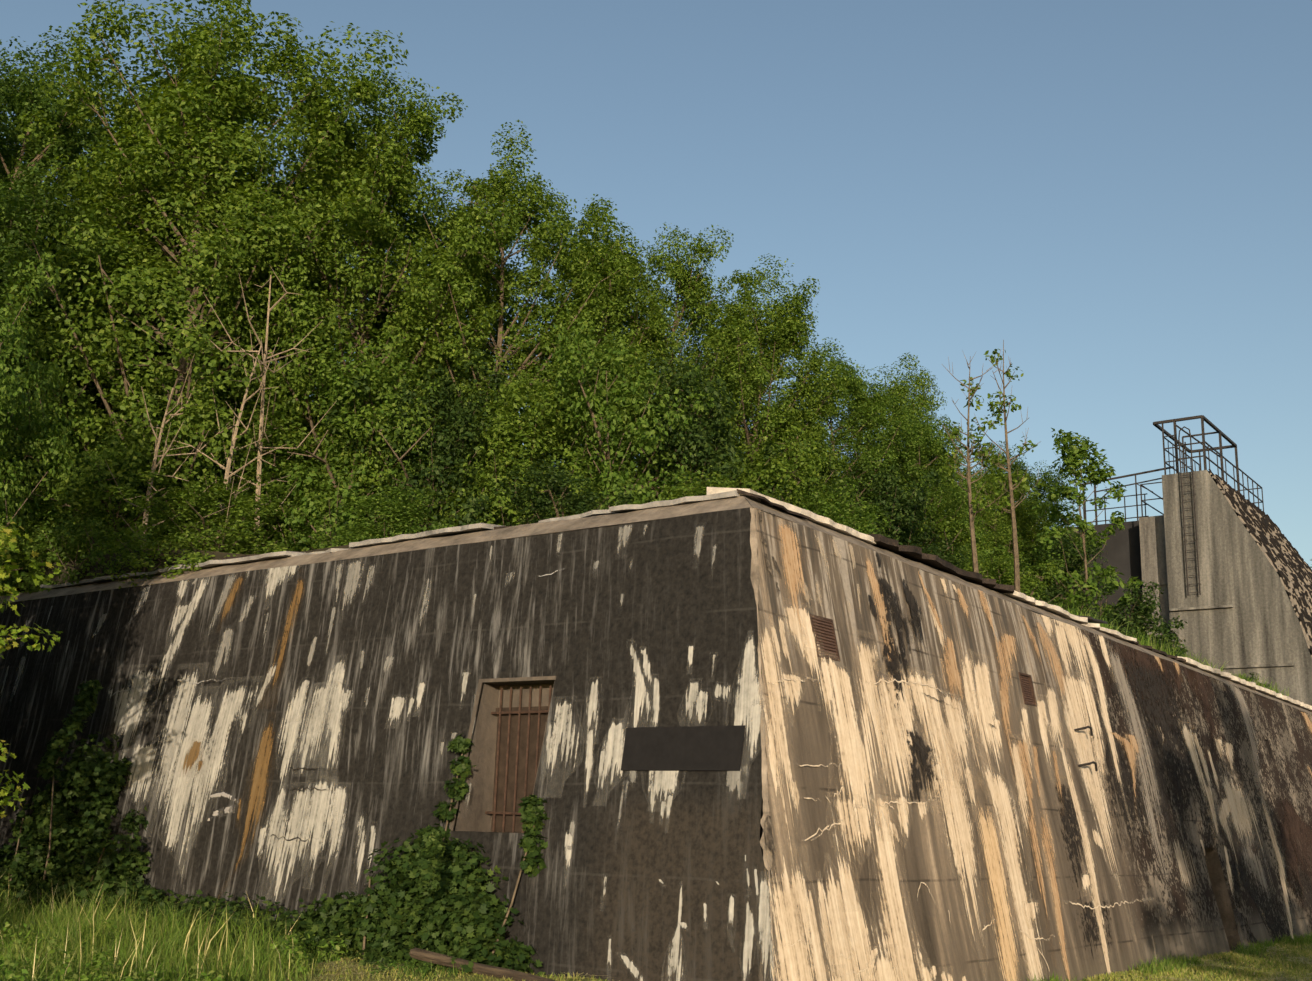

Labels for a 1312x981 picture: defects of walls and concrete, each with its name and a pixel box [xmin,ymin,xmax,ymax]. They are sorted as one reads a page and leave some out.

spalling [759,513,781,592]
peeling [868,553,924,709]
spalling [207,792,236,821]
spalling [764,815,775,864]
crack [799,763,843,841]
peeling [906,730,939,804]
peeling [1055,782,1112,959]
crack [1068,899,1139,909]
crack [983,924,1049,968]